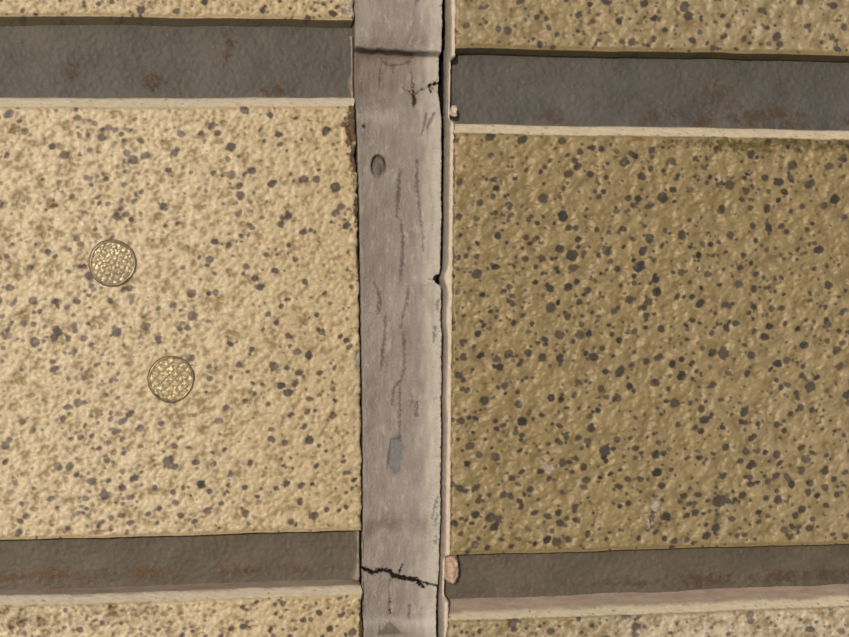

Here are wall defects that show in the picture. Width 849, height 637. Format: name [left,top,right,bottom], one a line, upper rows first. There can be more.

crack [361,564,437,588]